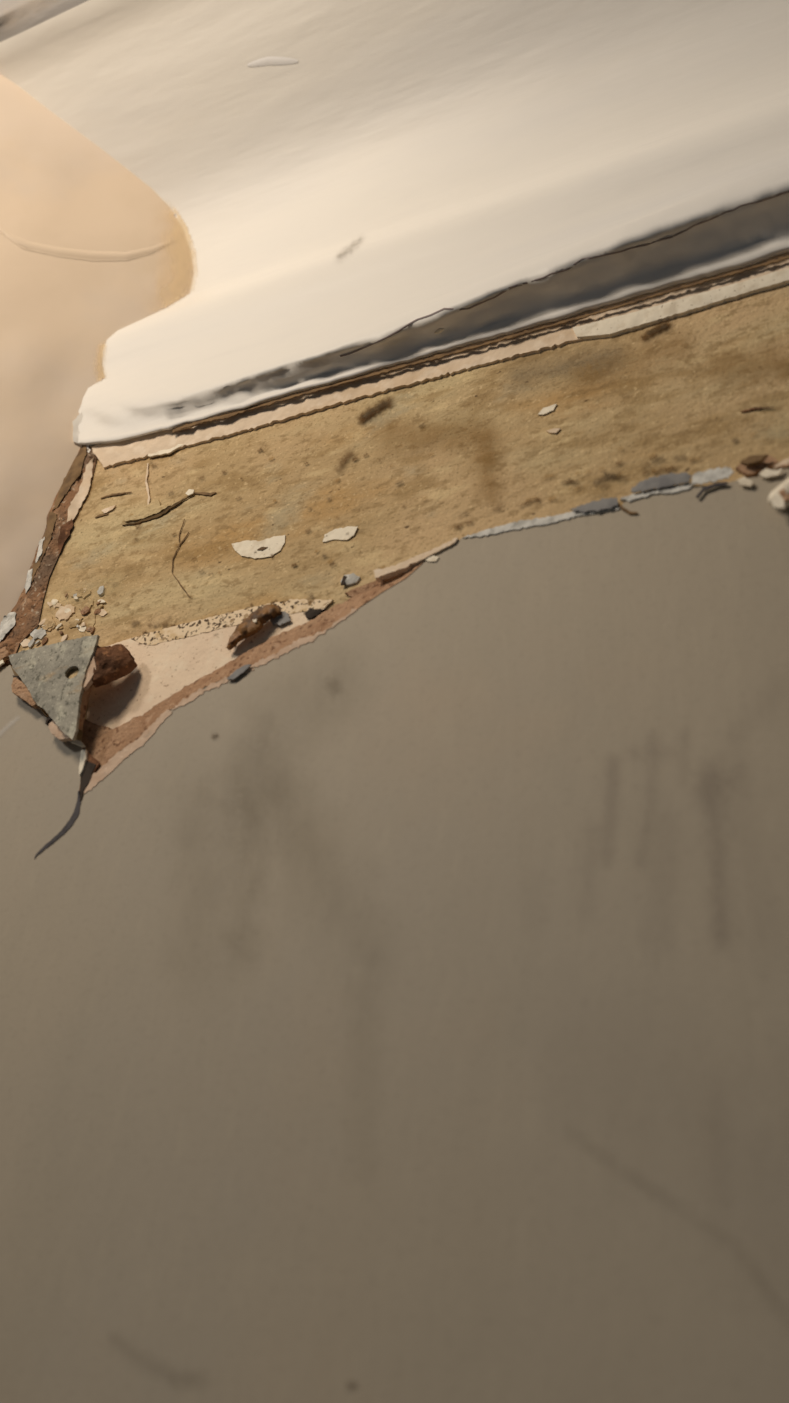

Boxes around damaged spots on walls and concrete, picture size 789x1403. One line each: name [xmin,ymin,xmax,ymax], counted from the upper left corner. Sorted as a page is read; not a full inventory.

flaking render [0,252,789,794]